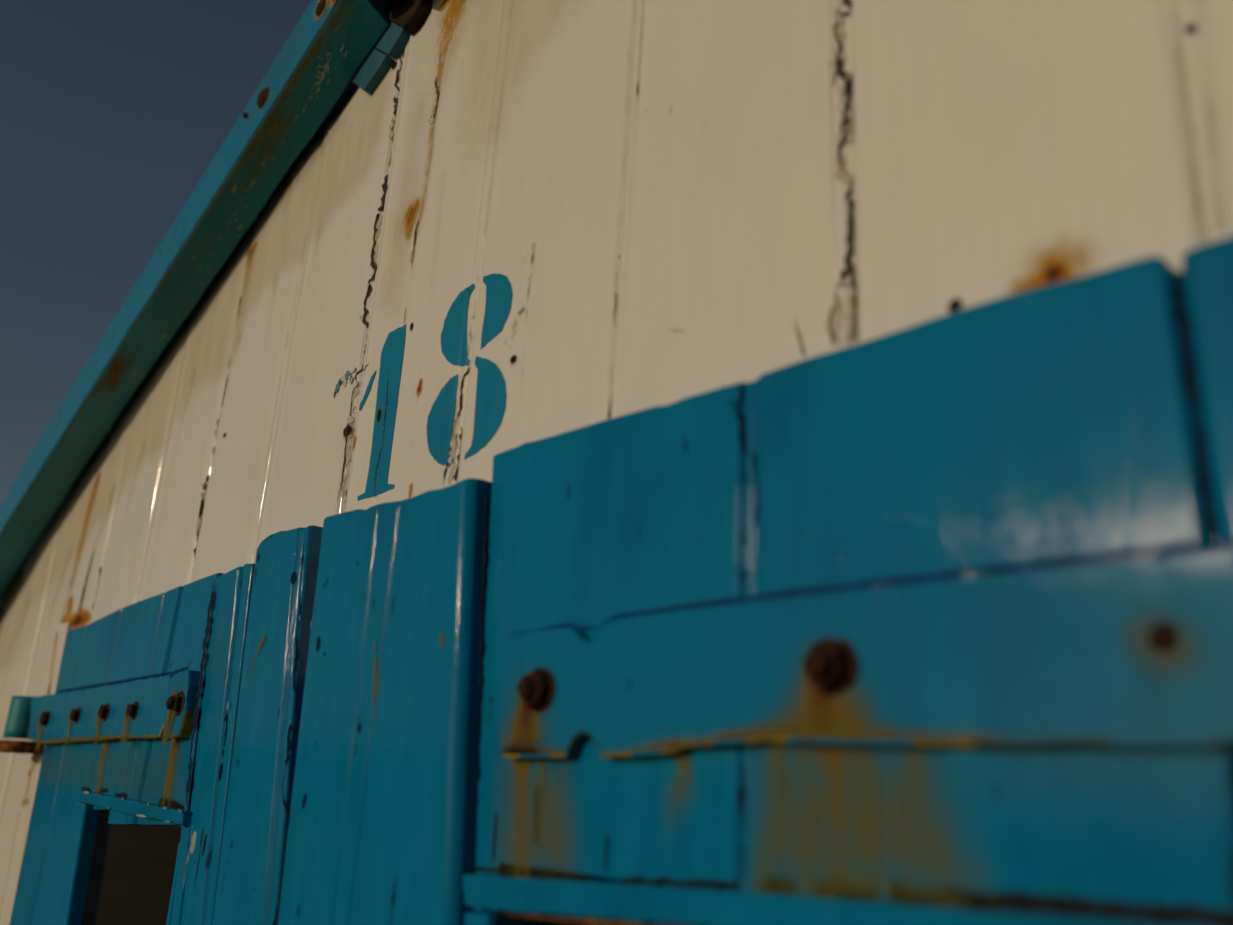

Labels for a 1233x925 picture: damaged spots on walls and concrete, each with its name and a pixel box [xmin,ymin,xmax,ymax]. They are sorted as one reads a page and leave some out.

crack [427,52,441,124]
corrosion [426,0,465,174]
corrosion [54,0,341,451]
crack [337,55,402,511]
corrosion [404,199,419,237]
crack [794,0,858,355]
corrosion [1014,250,1084,293]
peeling [333,364,368,397]
corrosion [22,691,179,806]
corrosion [502,697,564,876]
corrosion [628,671,996,780]